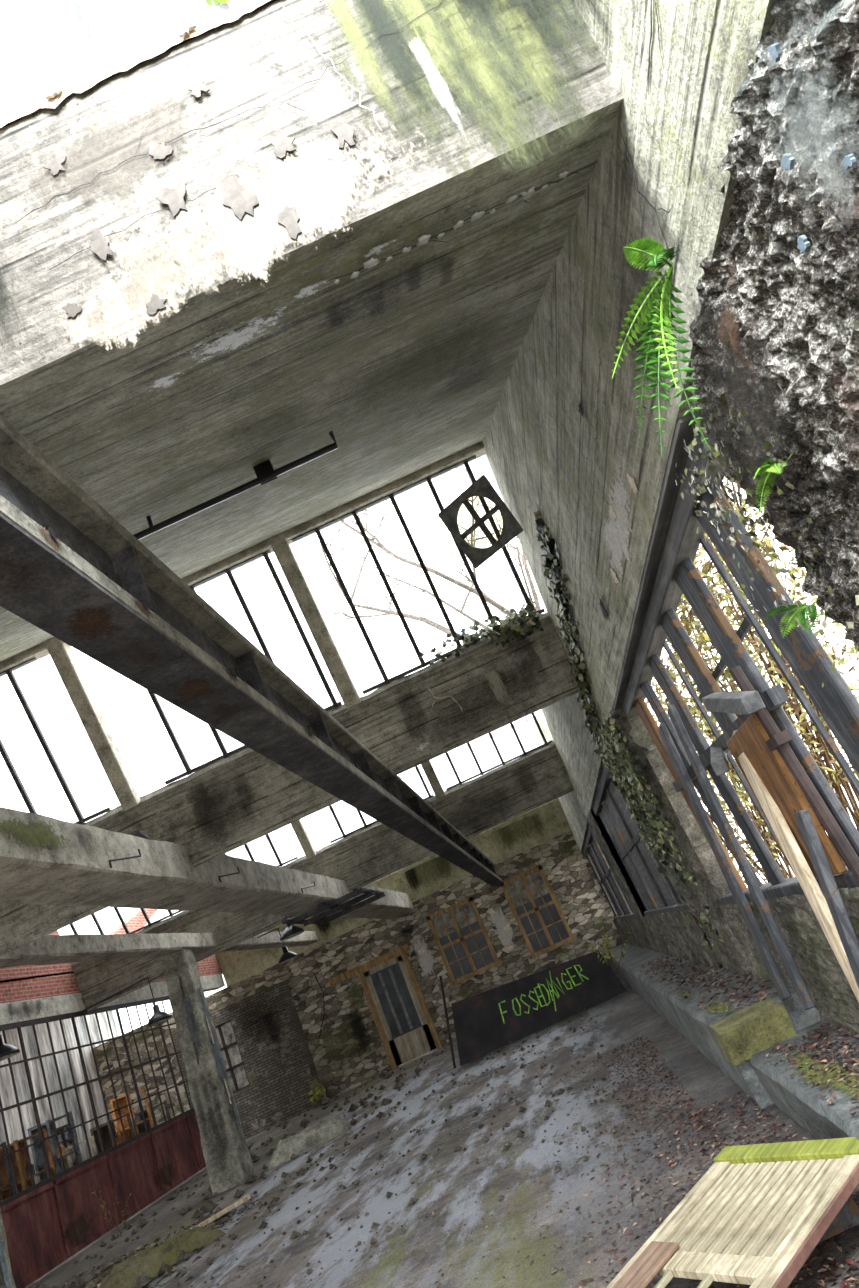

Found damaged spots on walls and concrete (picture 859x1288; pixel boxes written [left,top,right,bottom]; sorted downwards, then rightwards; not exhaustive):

peeling [19,77,209,203]
crack [13,1,443,225]
leakage [329,0,606,170]
crack [44,187,217,273]
peeling [62,111,426,350]
leakage [0,817,64,851]